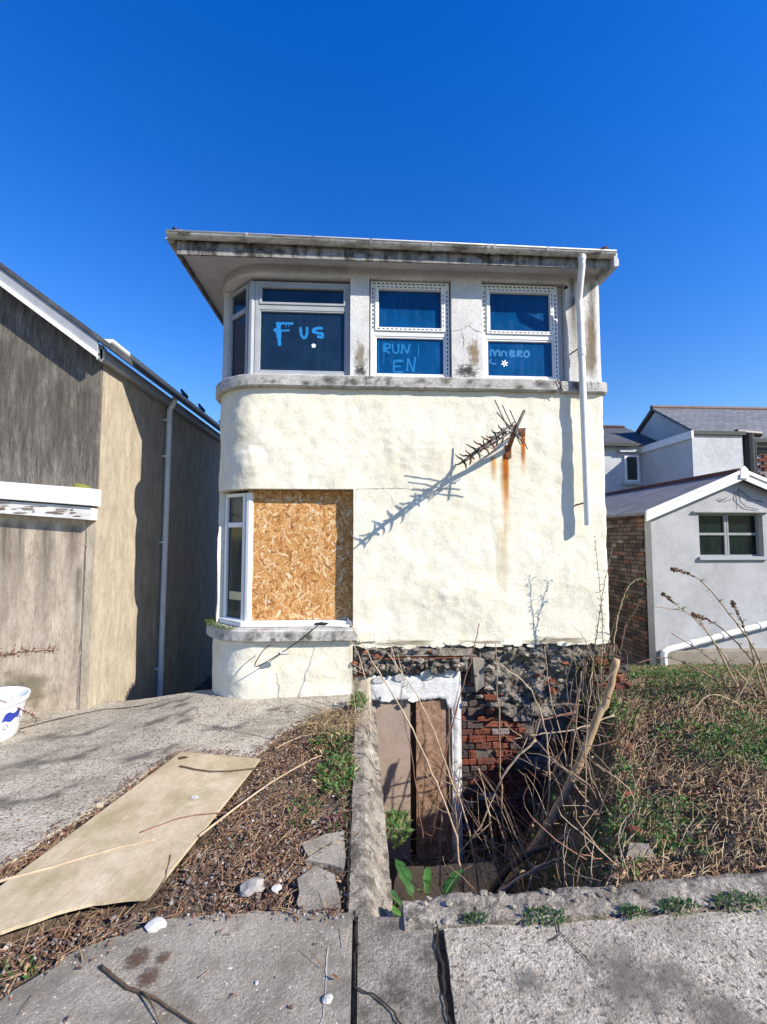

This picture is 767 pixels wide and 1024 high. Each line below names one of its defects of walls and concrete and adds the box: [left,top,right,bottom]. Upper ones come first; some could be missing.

damp [324,346,365,384]
damp [457,341,478,382]
corrosion [492,454,508,497]
spalling [351,641,613,803]